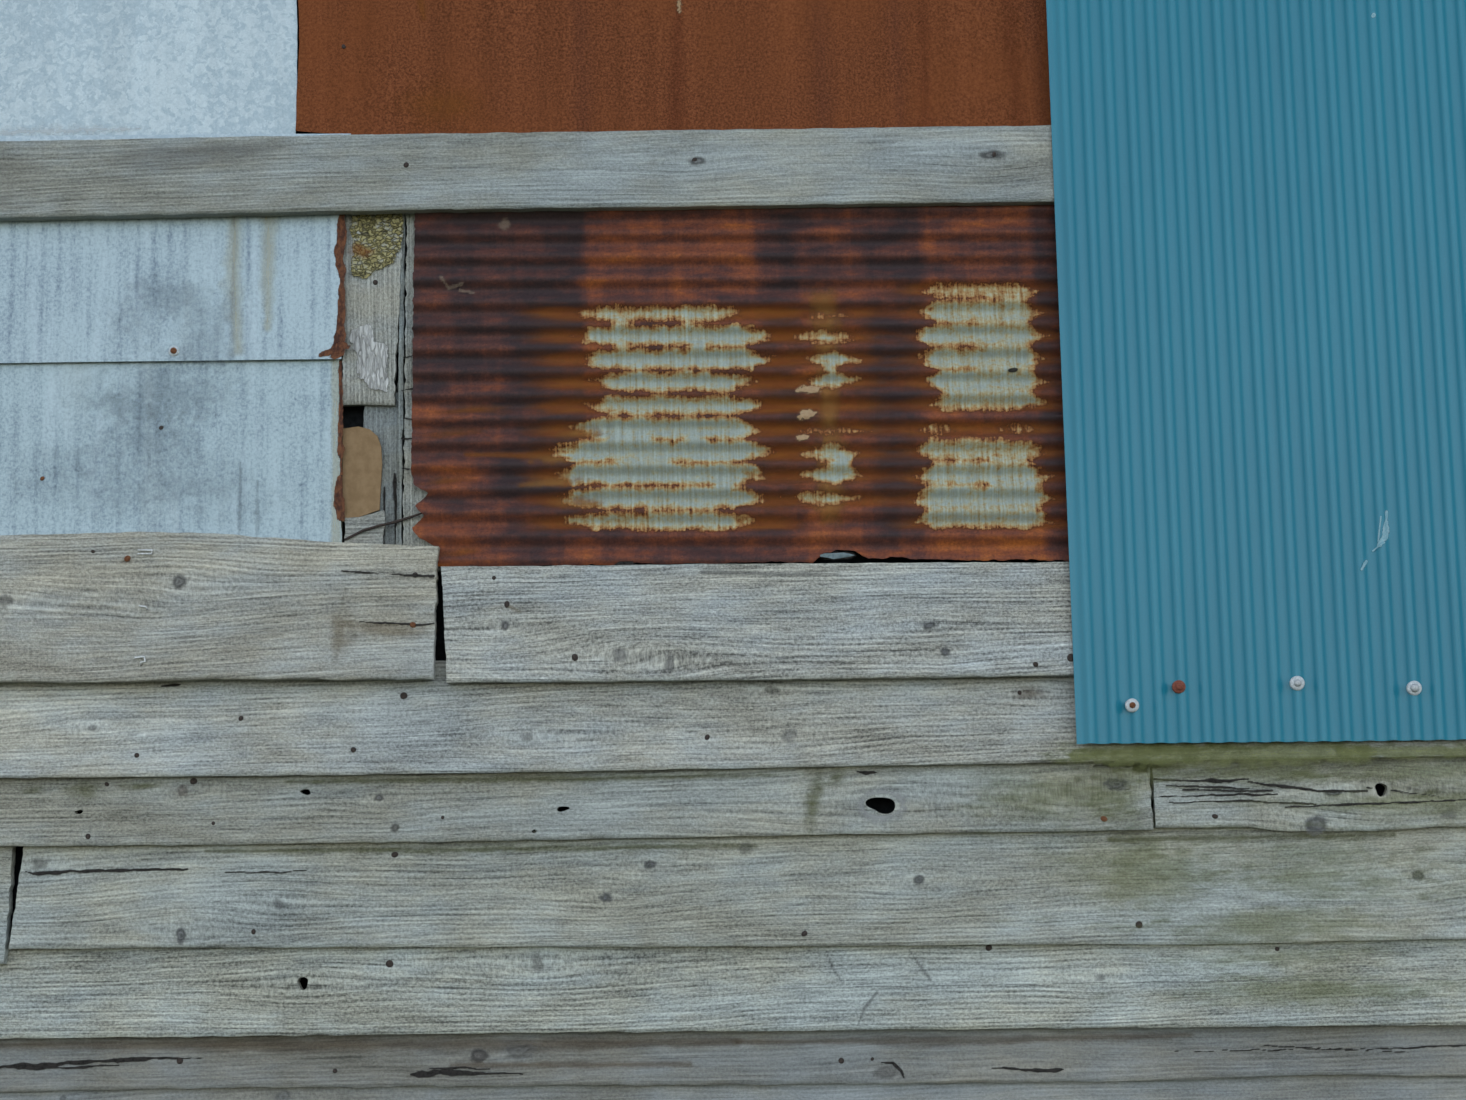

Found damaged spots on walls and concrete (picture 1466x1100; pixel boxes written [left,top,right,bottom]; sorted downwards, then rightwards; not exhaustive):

rust [319,215,350,521]
rust [812,294,839,522]
water stain [1069,741,1466,767]
crack [1153,778,1466,808]
crack [0,1057,201,1070]